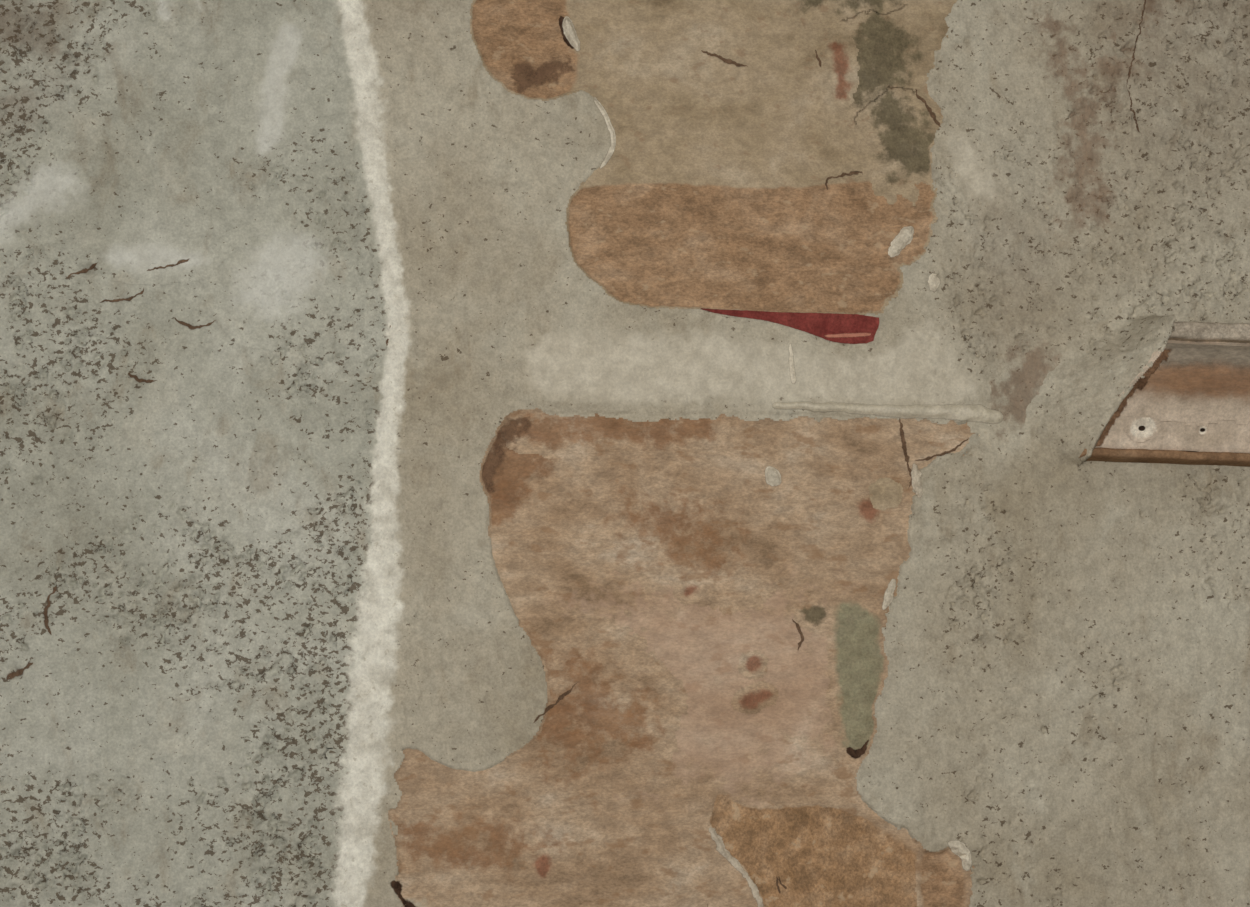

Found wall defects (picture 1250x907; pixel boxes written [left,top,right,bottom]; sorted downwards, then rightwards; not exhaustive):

peeling [470,0,938,315]
leakage [789,0,1014,220]
peeling [908,0,957,65]
leakage [1001,0,1205,255]
crack [899,418,968,487]
peeling [388,408,980,907]